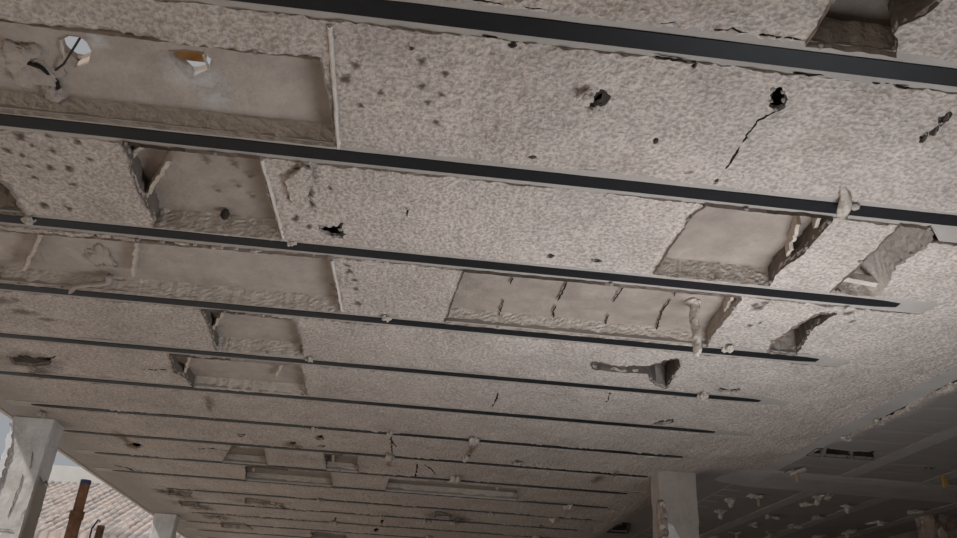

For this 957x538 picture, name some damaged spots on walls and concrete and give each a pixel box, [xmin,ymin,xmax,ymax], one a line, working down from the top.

crack [725,111,776,169]
spalling [0,114,900,323]
spalling [849,205,957,231]
spalling [0,283,819,362]
spalling [0,333,761,402]
spalling [0,371,715,433]
spalling [806,436,874,461]